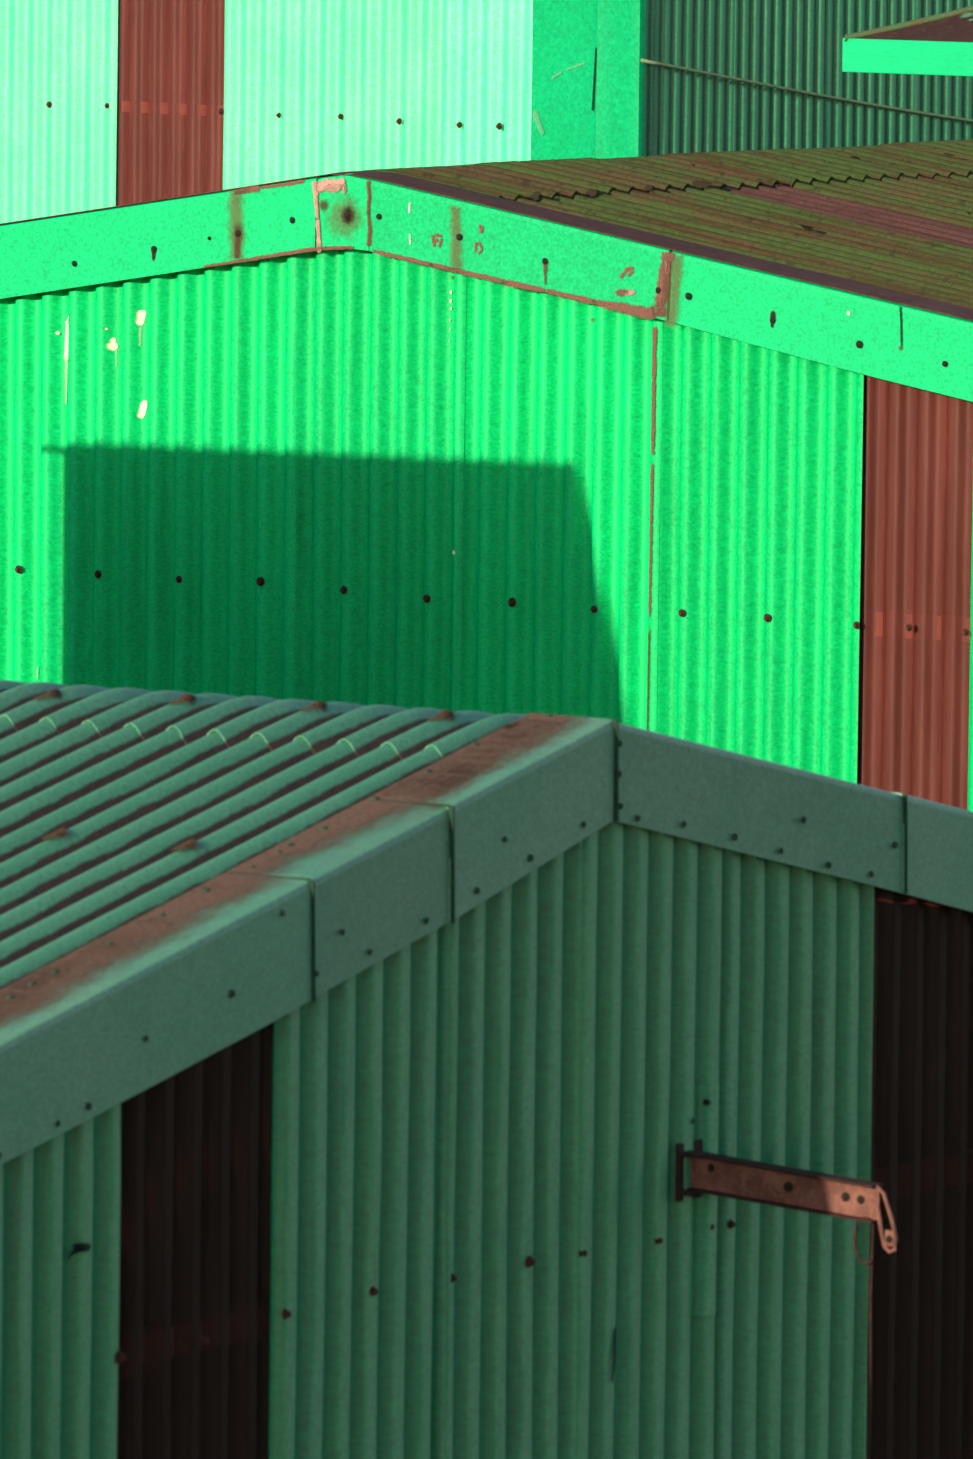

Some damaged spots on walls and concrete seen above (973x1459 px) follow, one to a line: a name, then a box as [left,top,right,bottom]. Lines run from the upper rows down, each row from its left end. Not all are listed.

rust [203,180,681,730]